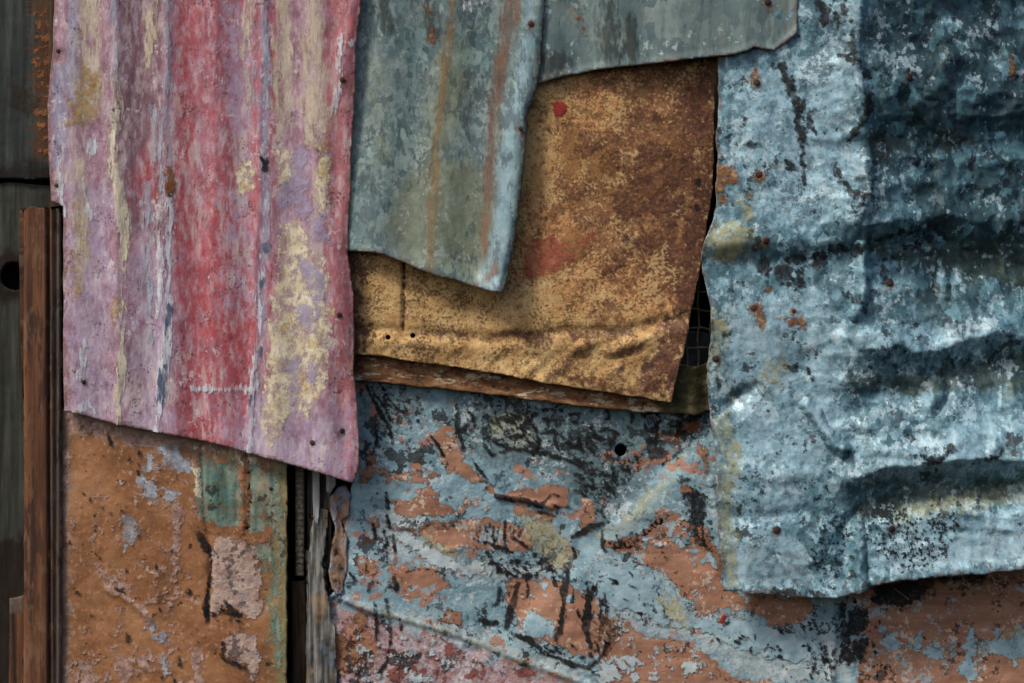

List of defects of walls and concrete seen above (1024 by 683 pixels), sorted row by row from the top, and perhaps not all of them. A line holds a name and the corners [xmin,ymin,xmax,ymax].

rust [27,7,50,156]
rust [481,0,519,280]
spalling [62,399,287,683]
rust [348,63,740,443]
peeling [327,425,828,683]
rust [747,285,807,330]
peeling [783,362,815,382]
peeling [799,503,1024,683]
peeling [920,443,957,465]